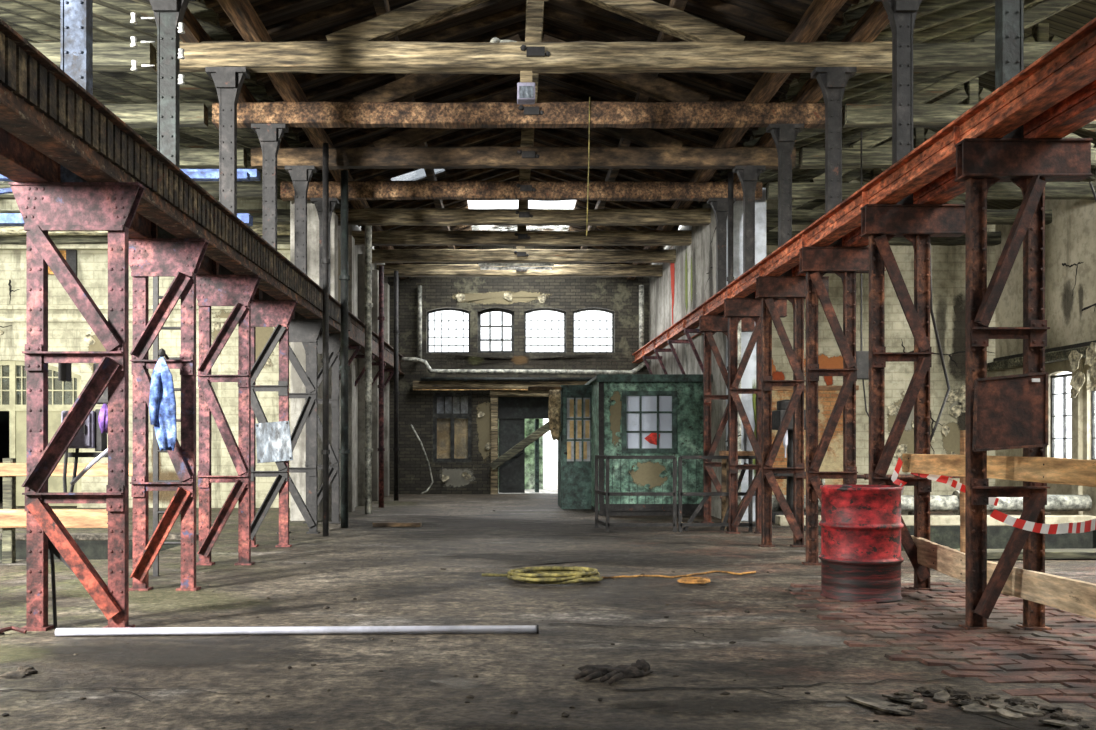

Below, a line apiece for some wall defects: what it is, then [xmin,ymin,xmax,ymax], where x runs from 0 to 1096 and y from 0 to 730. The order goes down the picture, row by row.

rust [772,358,785,380]
spalling [771,686,1092,730]